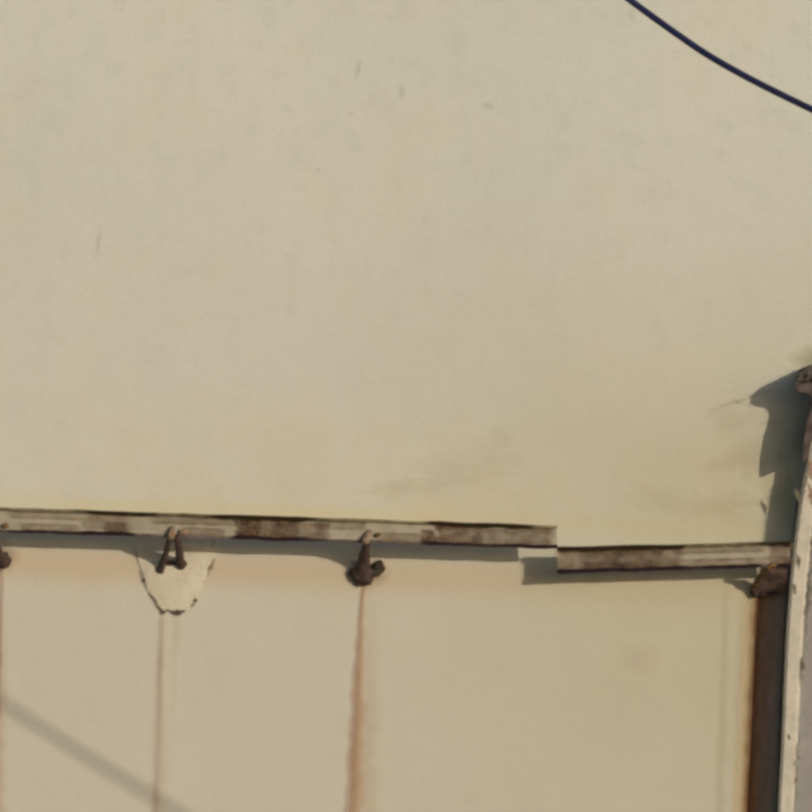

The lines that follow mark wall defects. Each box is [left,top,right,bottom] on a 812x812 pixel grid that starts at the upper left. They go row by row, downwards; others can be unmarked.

corrosion [736,575,790,812]